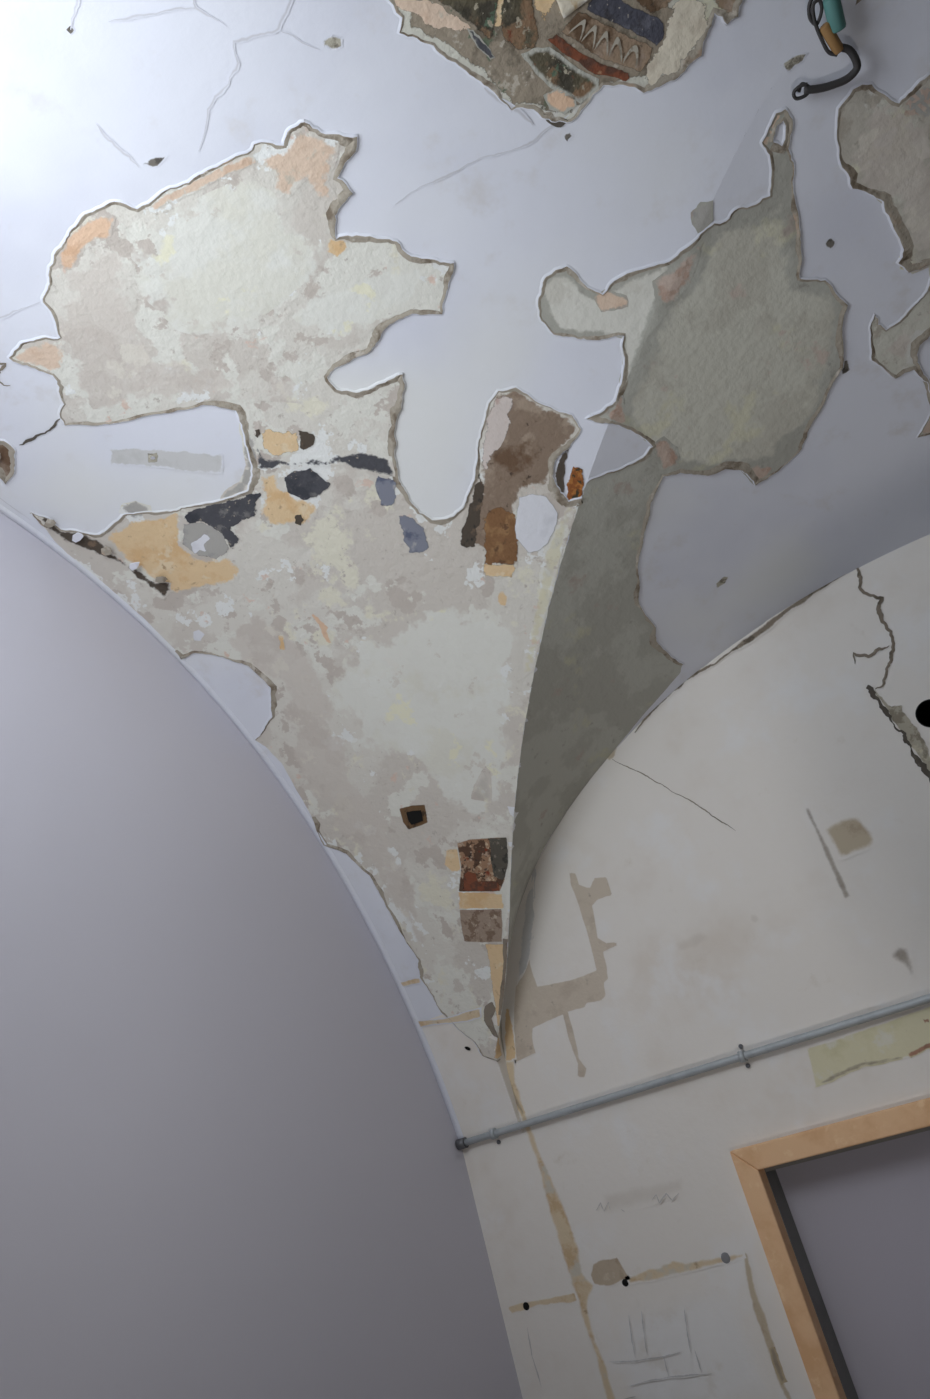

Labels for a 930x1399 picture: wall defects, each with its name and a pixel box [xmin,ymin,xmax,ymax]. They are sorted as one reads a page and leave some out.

crack [70,0,320,151]
flaking render [322,35,343,50]
flaking render [386,0,744,143]
flaking render [780,52,809,73]
crack [96,124,139,168]
flaking render [834,71,930,438]
flaking render [0,439,17,484]
flaking render [7,106,851,1062]
crack [635,568,930,782]
crack [612,759,734,830]
flaking render [805,1004,930,1089]